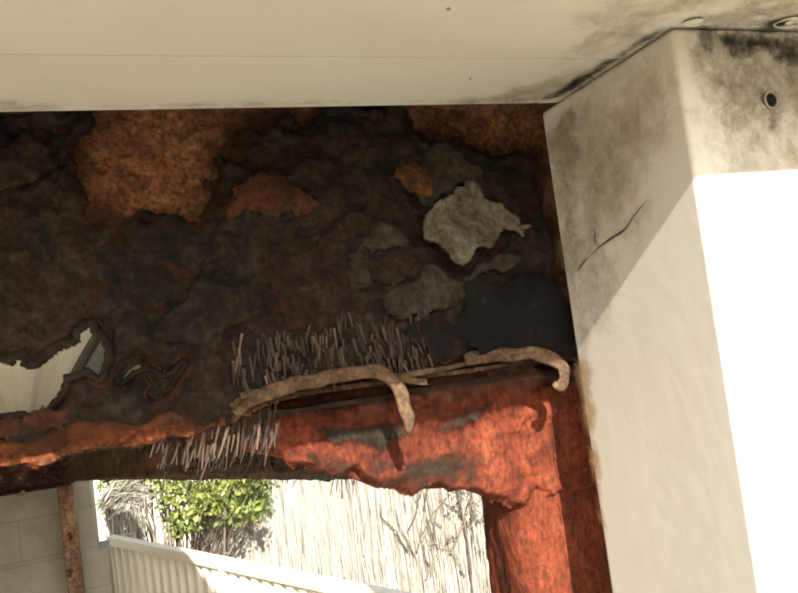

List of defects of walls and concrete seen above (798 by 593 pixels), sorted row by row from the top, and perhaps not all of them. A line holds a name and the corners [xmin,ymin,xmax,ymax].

water stain [543,32,659,99]
water stain [700,20,798,65]
rust [0,105,567,497]
spalling [382,142,578,392]
rust [566,354,594,430]
rust [590,449,599,478]